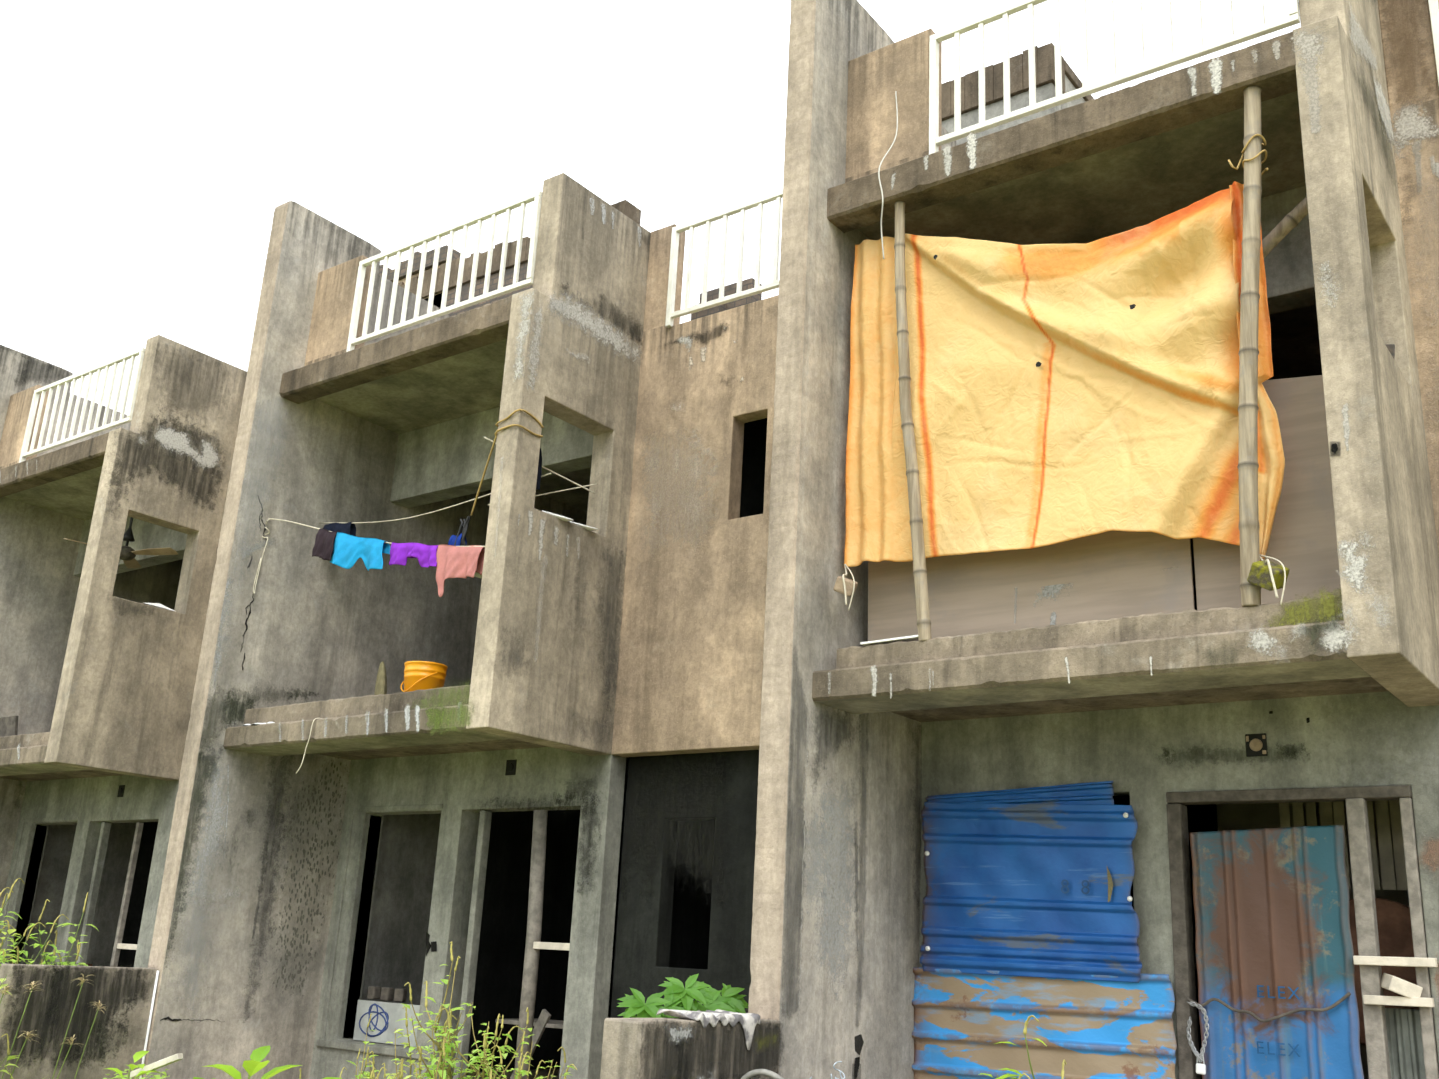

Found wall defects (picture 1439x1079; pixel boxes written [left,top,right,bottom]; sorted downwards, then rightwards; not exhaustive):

efflorescence [1188,58,1222,96]
water stain [565,288,641,342]
water stain [109,418,222,503]
crack [240,495,267,670]
water stain [405,706,441,731]
water stain [640,1019,784,1079]